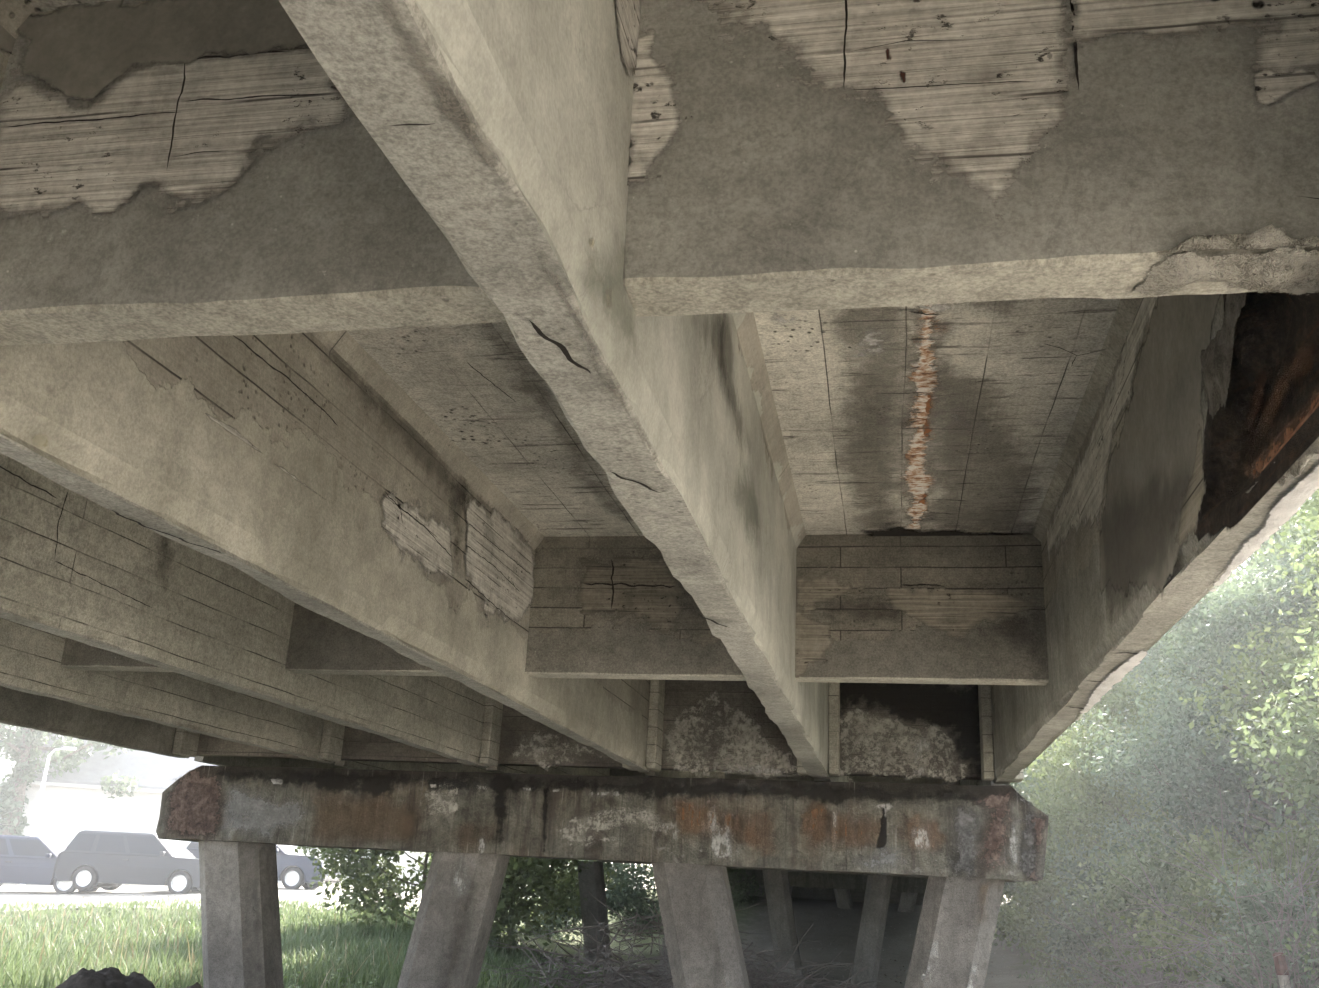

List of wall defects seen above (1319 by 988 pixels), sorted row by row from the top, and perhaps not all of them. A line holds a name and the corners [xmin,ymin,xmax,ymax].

peeling [0,46,362,222]
peeling [612,0,692,186]
peeling [689,0,1319,220]
rust [880,303,963,530]
spalling [1047,224,1319,563]
rust [1245,344,1319,479]
damp [862,527,1016,536]
spalling [1185,401,1319,618]
damp [217,683,981,867]
rust [667,802,770,857]
rust [908,815,943,849]
spalling [1076,650,1148,721]